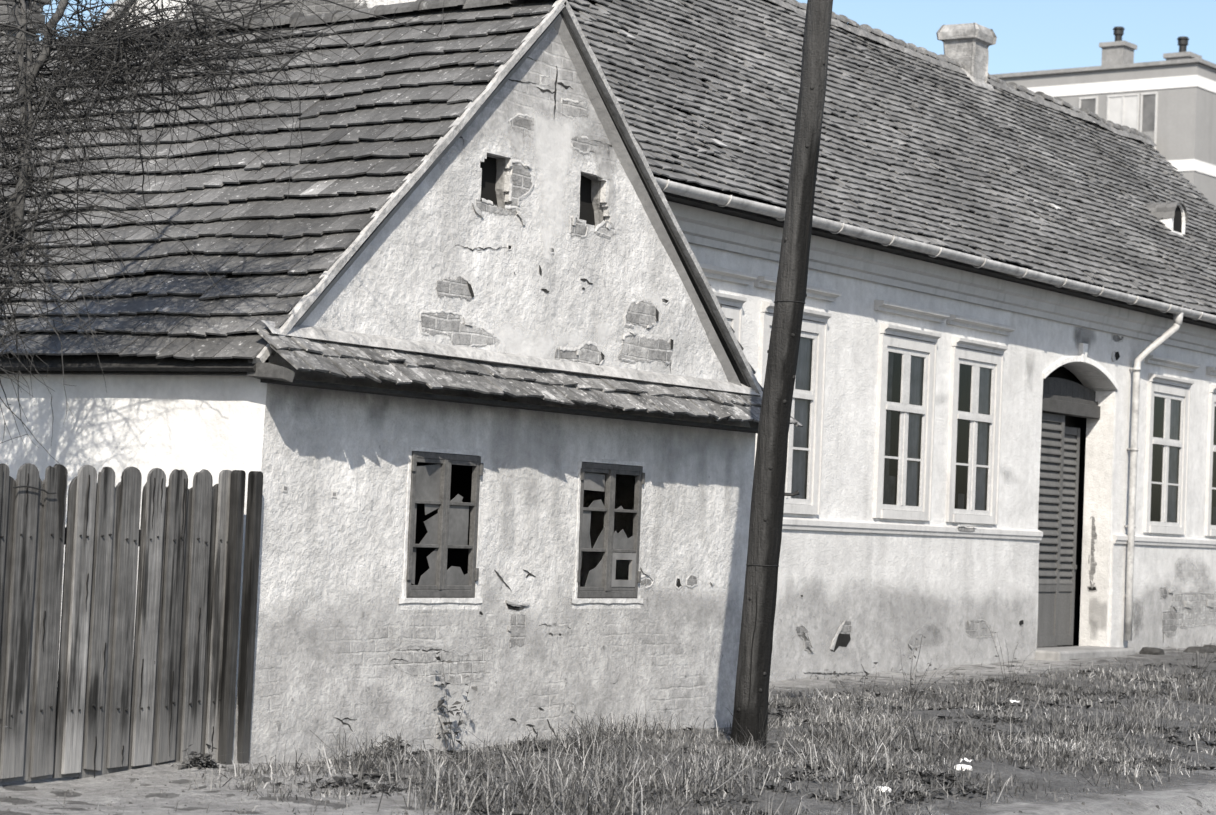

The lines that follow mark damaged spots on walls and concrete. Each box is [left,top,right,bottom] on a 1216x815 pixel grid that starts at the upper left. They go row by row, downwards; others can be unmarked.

flaking render [173,0,368,26]
crack [509,57,572,124]
peeling [441,29,621,258]
flaking render [419,276,673,366]
flaking render [506,600,530,647]
spalling [796,624,814,654]
spalling [830,620,852,652]
flaking render [1160,560,1216,642]